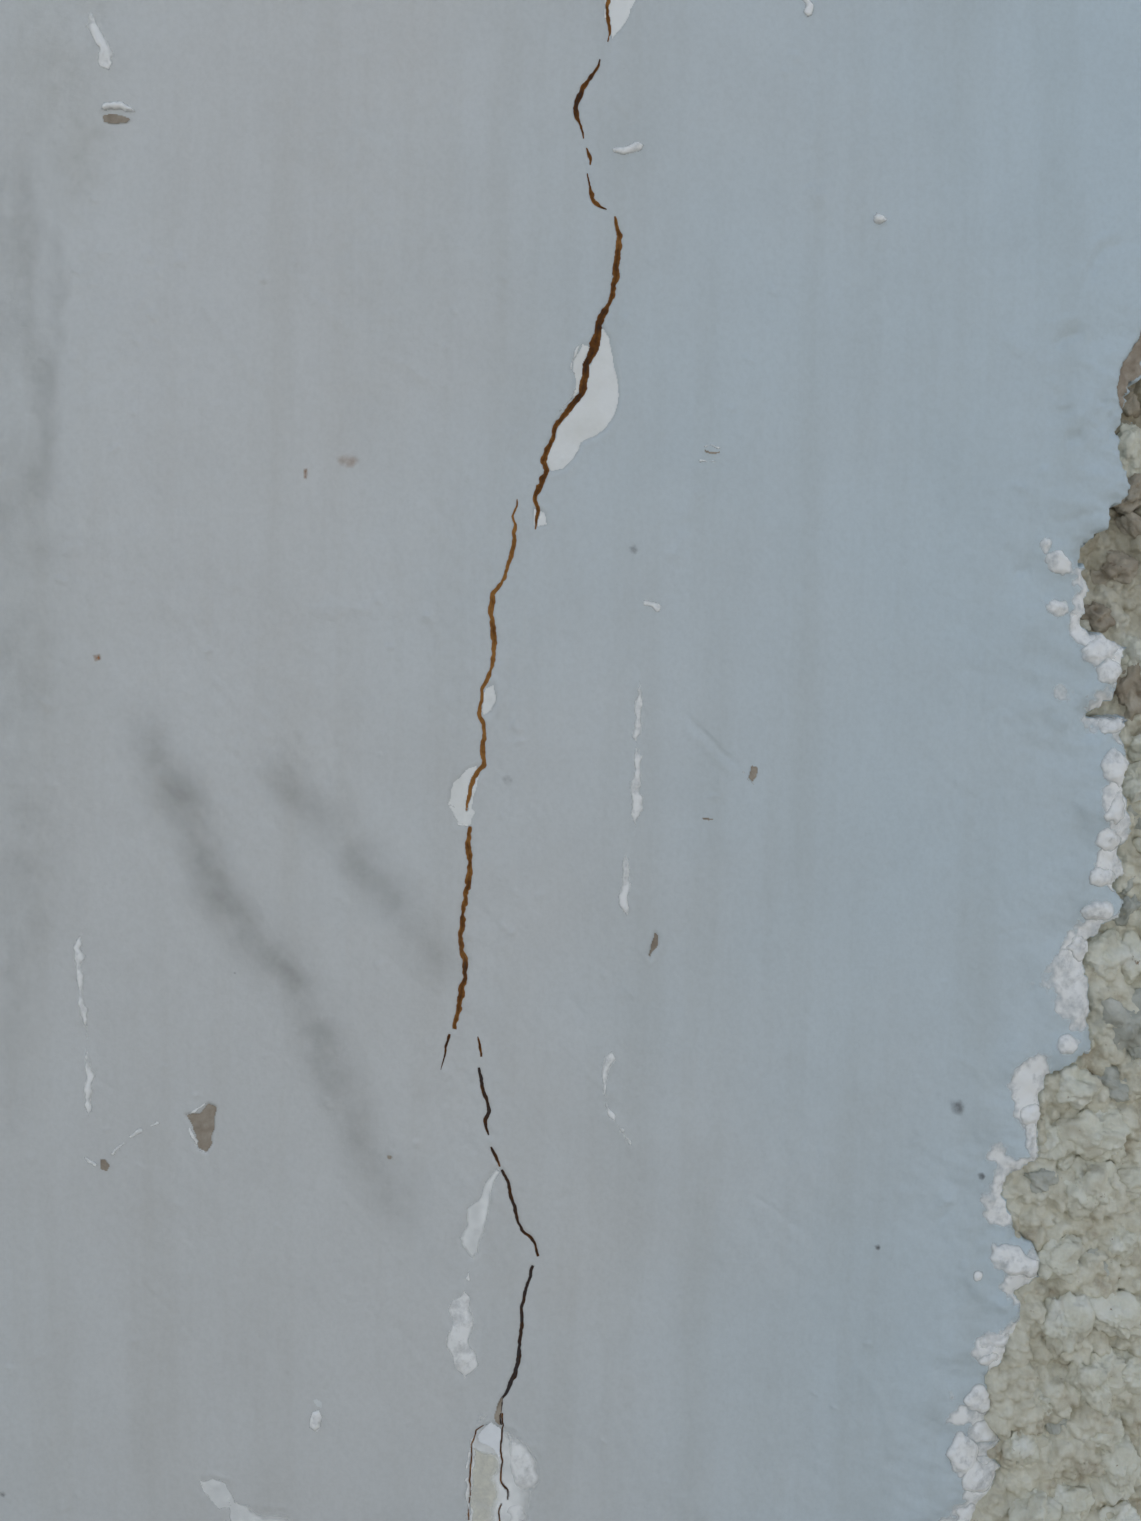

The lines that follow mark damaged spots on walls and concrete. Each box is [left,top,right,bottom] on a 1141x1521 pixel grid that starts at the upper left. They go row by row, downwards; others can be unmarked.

peeling [604,0,635,39]
peeling [547,329,619,471]
crack [441,0,623,1521]
flaking render [940,334,1141,1521]
peeling [186,1103,217,1152]
peeling [200,1479,285,1521]
peeling [465,1422,538,1521]